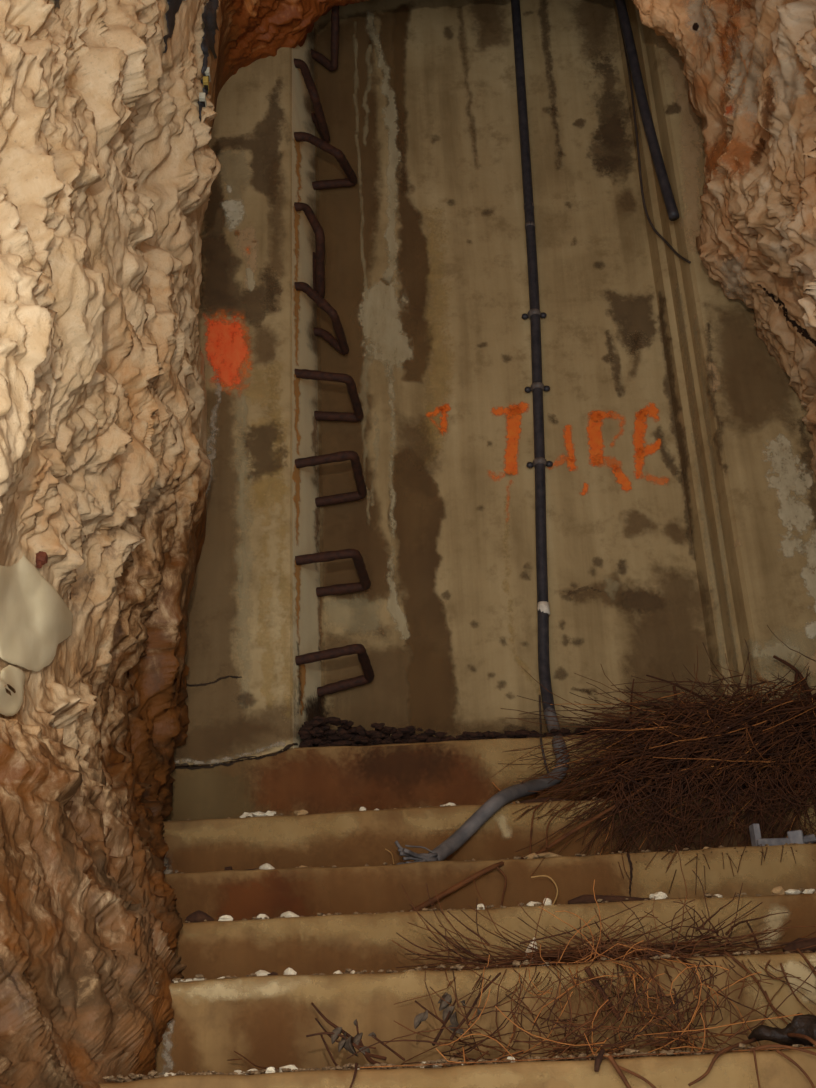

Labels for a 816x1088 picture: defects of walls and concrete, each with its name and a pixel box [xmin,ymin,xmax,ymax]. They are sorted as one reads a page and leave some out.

damp [577,0,636,175]
corrosion [292,140,317,540]
damp [174,0,592,762]
damp [603,291,693,554]
crack [175,742,298,770]
corrosion [298,664,306,715]
corrosion [258,745,497,815]
damp [623,573,717,727]